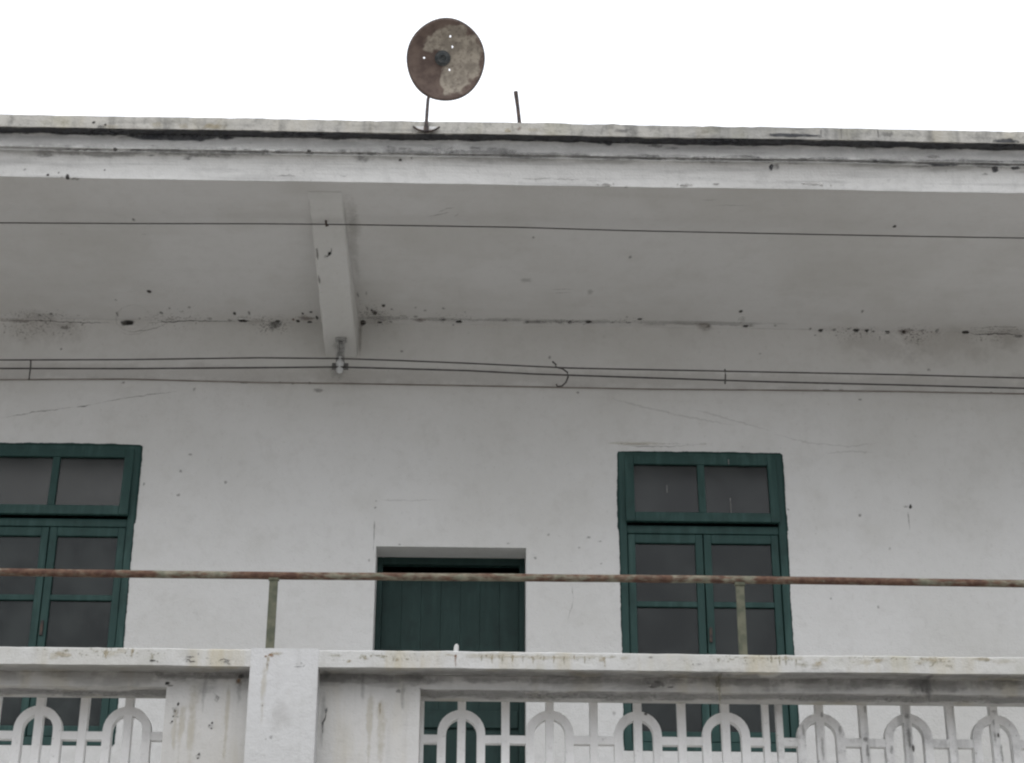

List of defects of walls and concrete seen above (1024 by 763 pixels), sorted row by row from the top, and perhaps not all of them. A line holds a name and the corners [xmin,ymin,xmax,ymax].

water stain [0,127,1024,162]